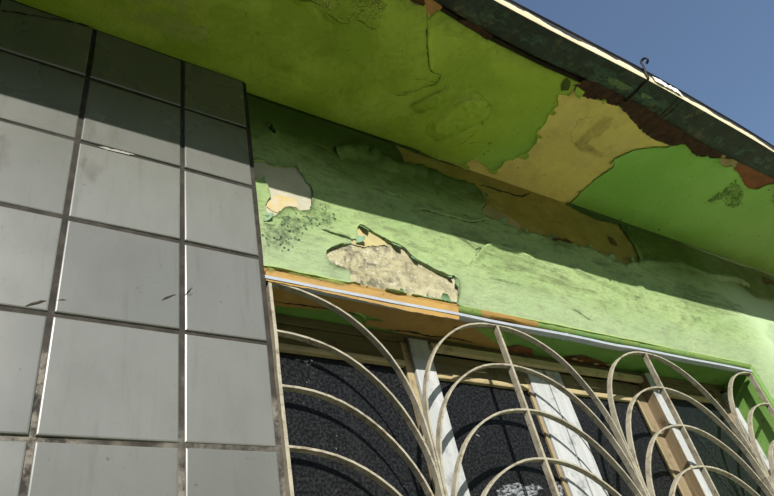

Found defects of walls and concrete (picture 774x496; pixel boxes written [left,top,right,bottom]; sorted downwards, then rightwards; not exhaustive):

crack [397,11,492,145]
peeling [254,162,314,221]
damp [262,204,336,251]
peeling [264,225,549,356]
peeling [395,78,774,288]